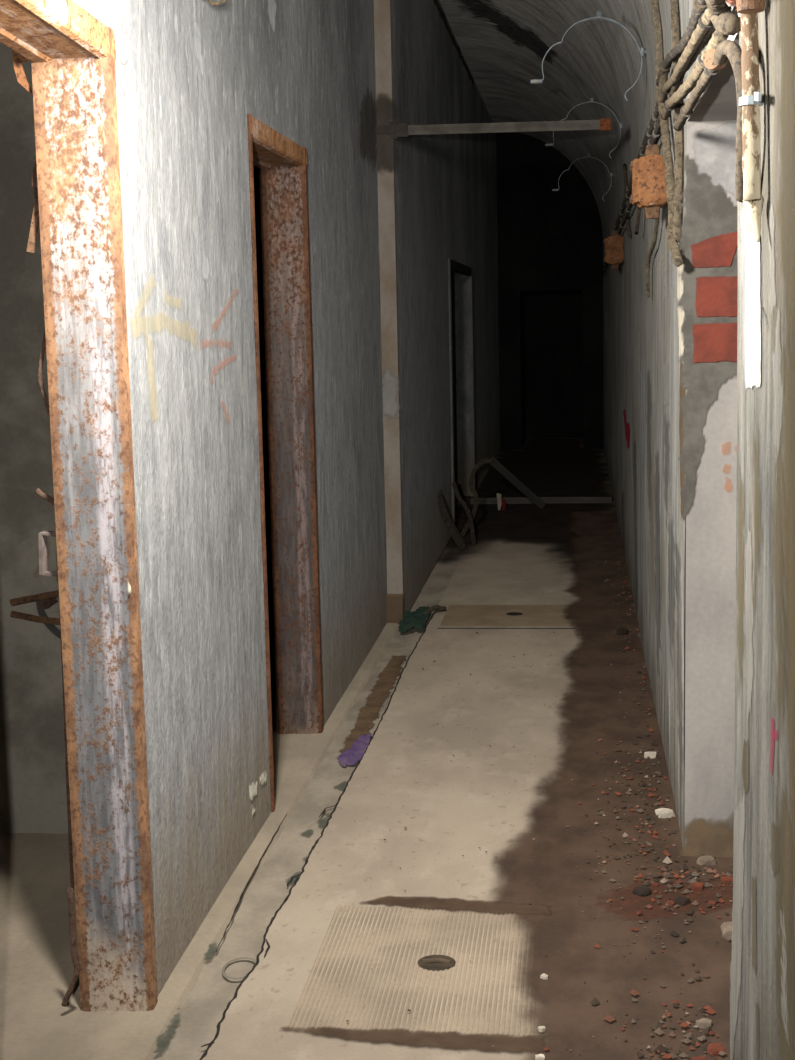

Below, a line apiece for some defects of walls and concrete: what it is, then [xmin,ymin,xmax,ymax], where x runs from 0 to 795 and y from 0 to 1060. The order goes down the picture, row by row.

damp [453,0,558,65]
flaking render [677,156,761,518]
crack [199,610,437,1060]